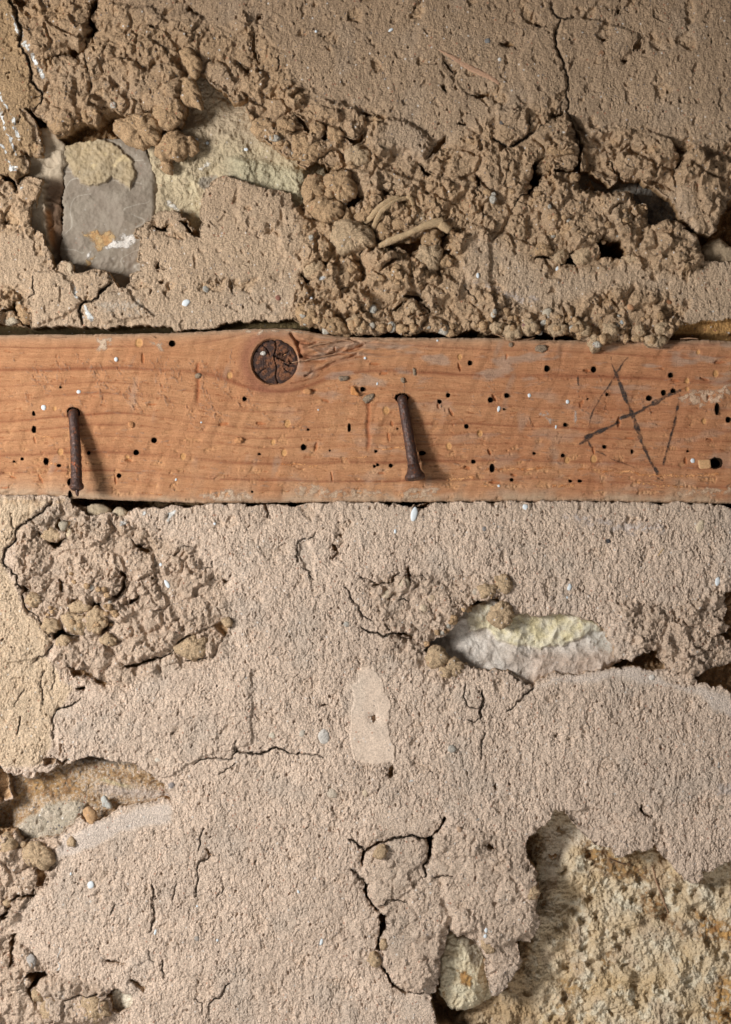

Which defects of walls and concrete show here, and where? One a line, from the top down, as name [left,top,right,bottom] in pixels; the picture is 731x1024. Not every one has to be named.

spalling [11,0,731,354]
crack [493,2,574,208]
crack [3,503,80,737]
crack [194,740,323,775]
crack [350,839,365,883]
crack [389,834,453,878]